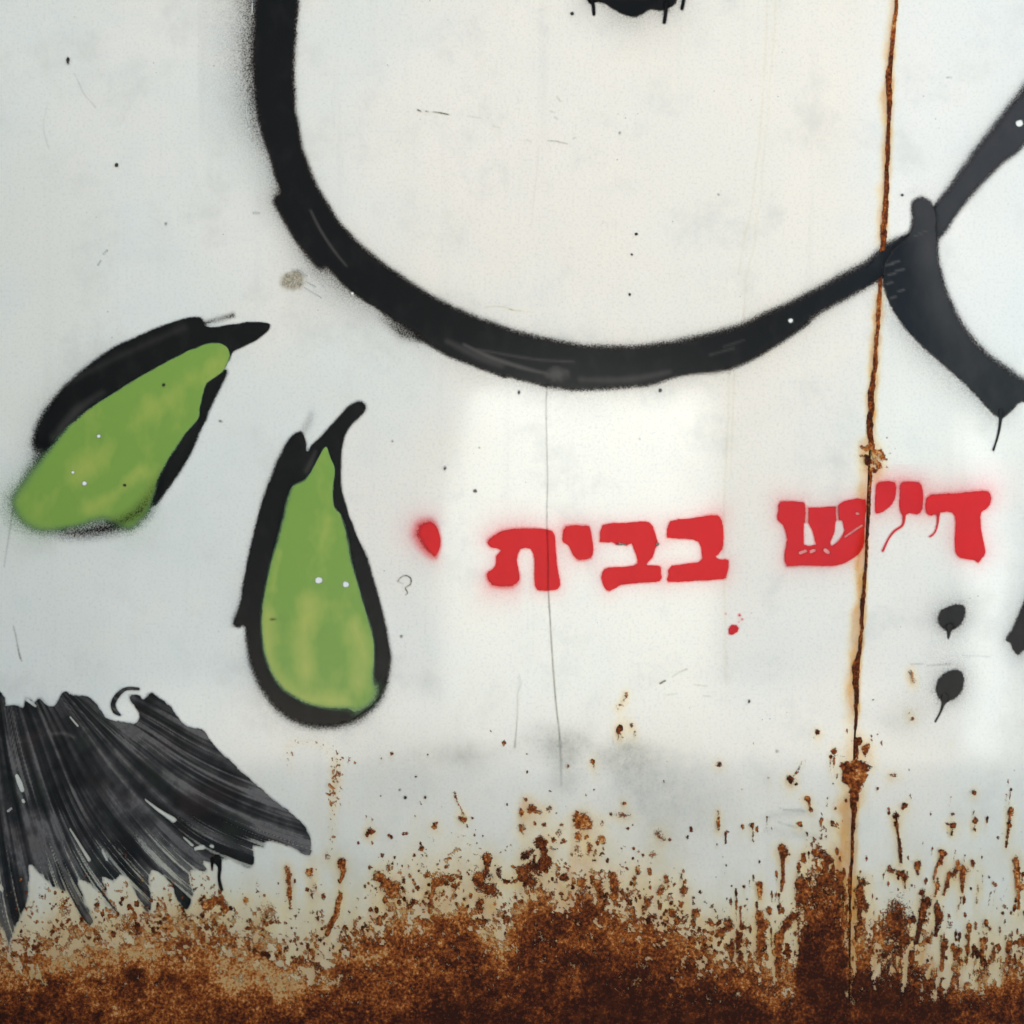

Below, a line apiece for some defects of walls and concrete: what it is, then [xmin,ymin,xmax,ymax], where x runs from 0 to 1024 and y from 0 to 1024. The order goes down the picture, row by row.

rust [880,0,898,252]
rust [0,278,1024,1024]